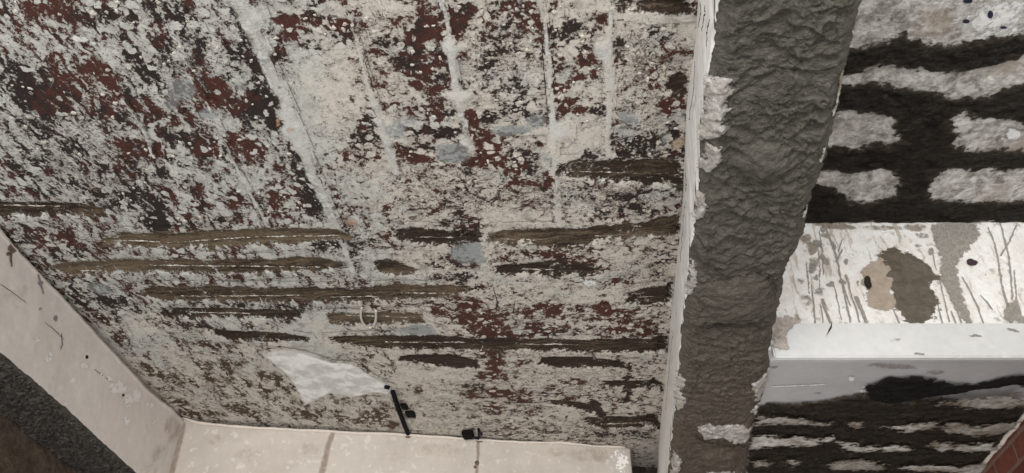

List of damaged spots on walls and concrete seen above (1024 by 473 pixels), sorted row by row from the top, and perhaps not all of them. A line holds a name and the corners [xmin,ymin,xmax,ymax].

peeling [0,0,322,227]
peeling [267,0,694,227]
peeling [5,222,104,258]
flaking render [60,279,426,431]
peeling [418,249,666,338]
peeling [449,353,640,442]